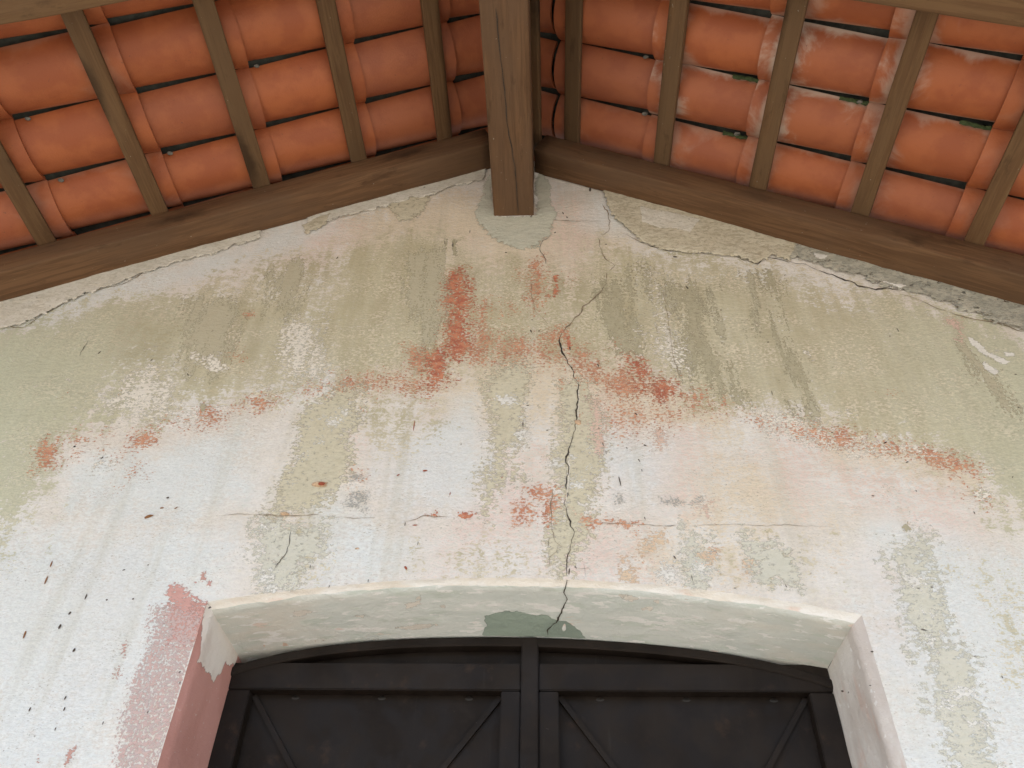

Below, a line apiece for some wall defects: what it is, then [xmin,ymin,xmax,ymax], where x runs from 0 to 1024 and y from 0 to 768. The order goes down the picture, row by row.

leakage [171,293,248,384]
rust [26,255,1003,515]
crack [531,204,681,634]
leakage [590,254,753,410]
leakage [737,268,823,434]
peeling [740,391,944,463]
crack [738,257,1023,332]
leakage [954,336,1024,421]
rust [509,481,670,583]
peeling [102,571,238,768]
peeling [483,611,584,638]
peeling [873,520,1013,768]